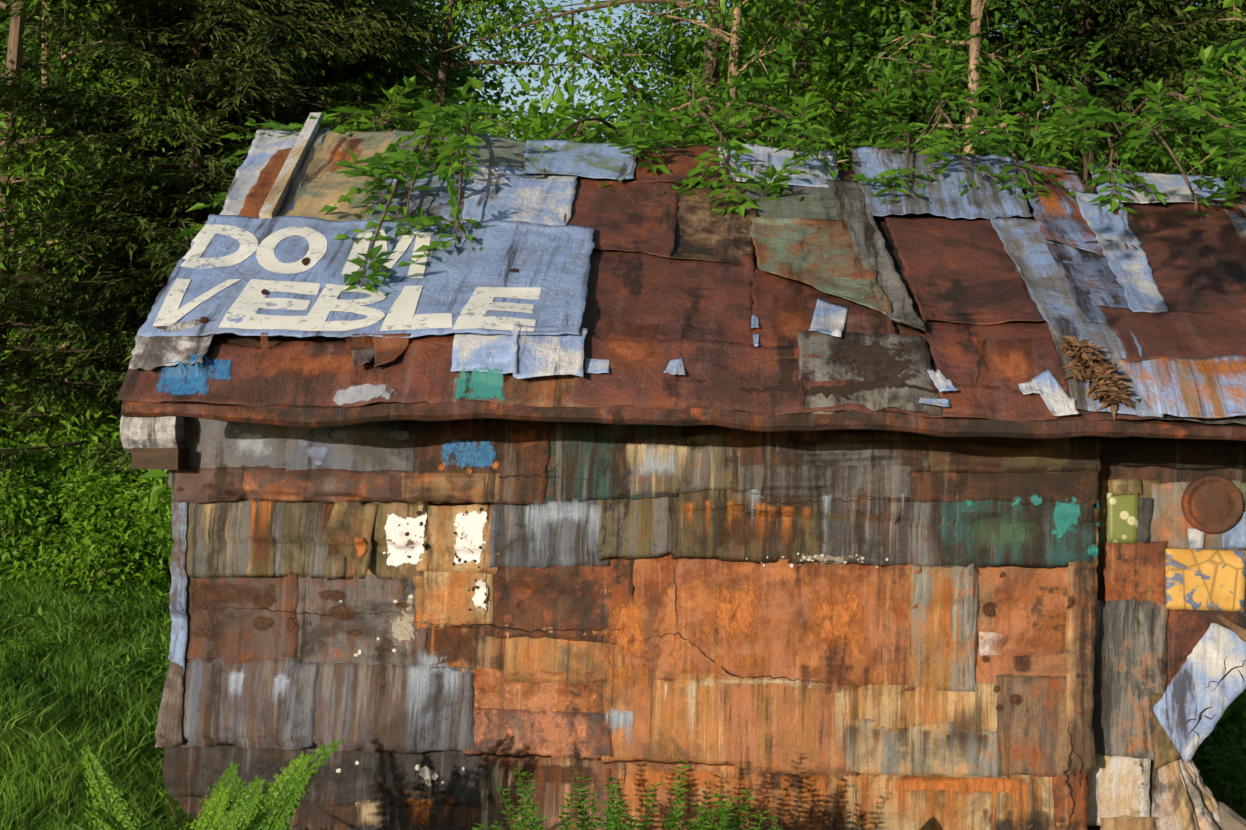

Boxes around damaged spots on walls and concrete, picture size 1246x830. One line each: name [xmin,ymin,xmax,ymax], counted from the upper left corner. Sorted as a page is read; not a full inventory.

peeling [156,354,232,395]
corrosion [826,340,917,390]
peeling [438,439,499,474]
peeling [382,511,427,567]
peeling [452,507,490,611]
peeling [1012,495,1103,571]
corrosion [434,627,485,666]
crack [181,569,832,683]
corrosion [604,594,647,686]
corrosion [1014,655,1031,672]
corrosion [503,765,846,818]
corrosion [886,776,1041,826]